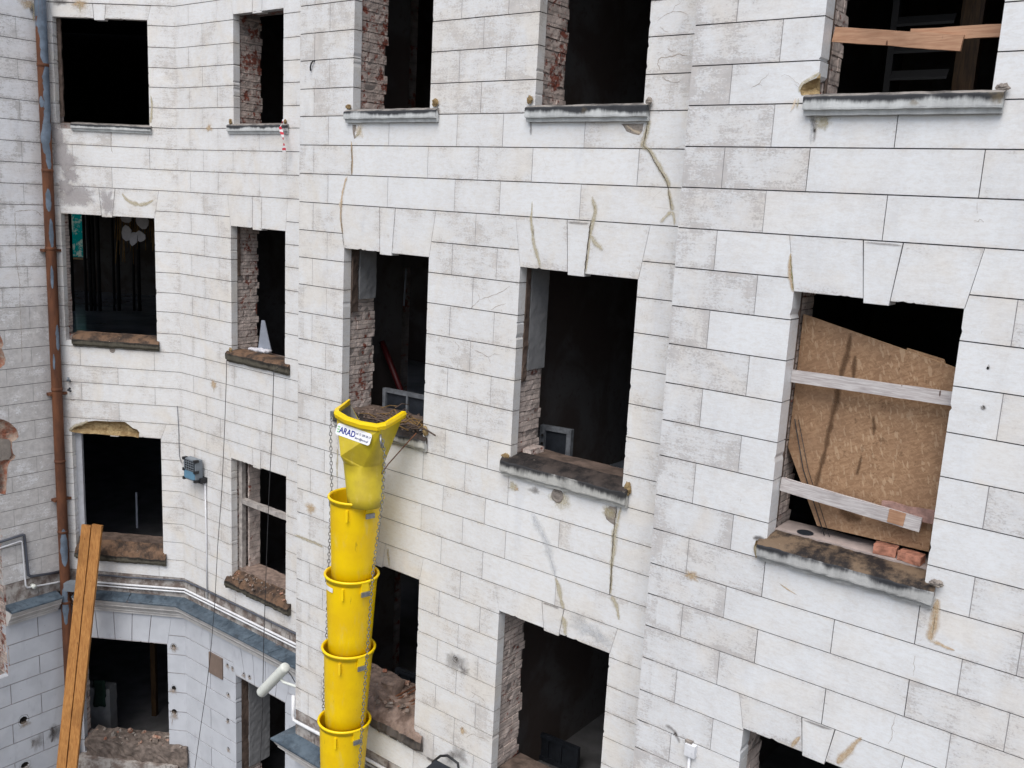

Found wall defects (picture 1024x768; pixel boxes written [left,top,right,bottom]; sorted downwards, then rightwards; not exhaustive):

spalling [782,73,820,109]
crack [340,142,353,245]
crack [641,121,675,224]
spalling [0,419,19,495]
spalling [70,421,139,438]
crack [609,507,621,594]